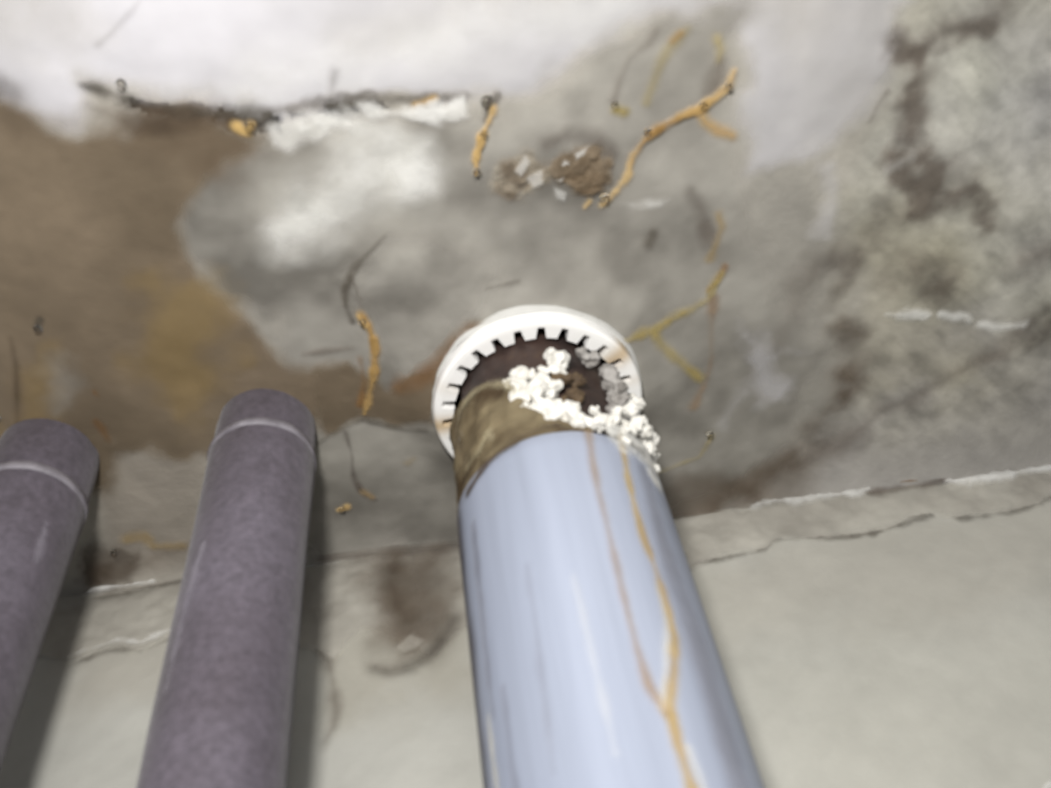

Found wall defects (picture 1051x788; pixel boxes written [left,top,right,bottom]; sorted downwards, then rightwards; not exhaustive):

spalling [491,134,615,200]
water stain [0,81,484,493]
crack [308,243,427,445]
water stain [831,318,868,340]
water stain [503,346,661,473]
water stain [833,362,866,406]
crack [336,471,375,512]
water stain [663,460,1051,519]